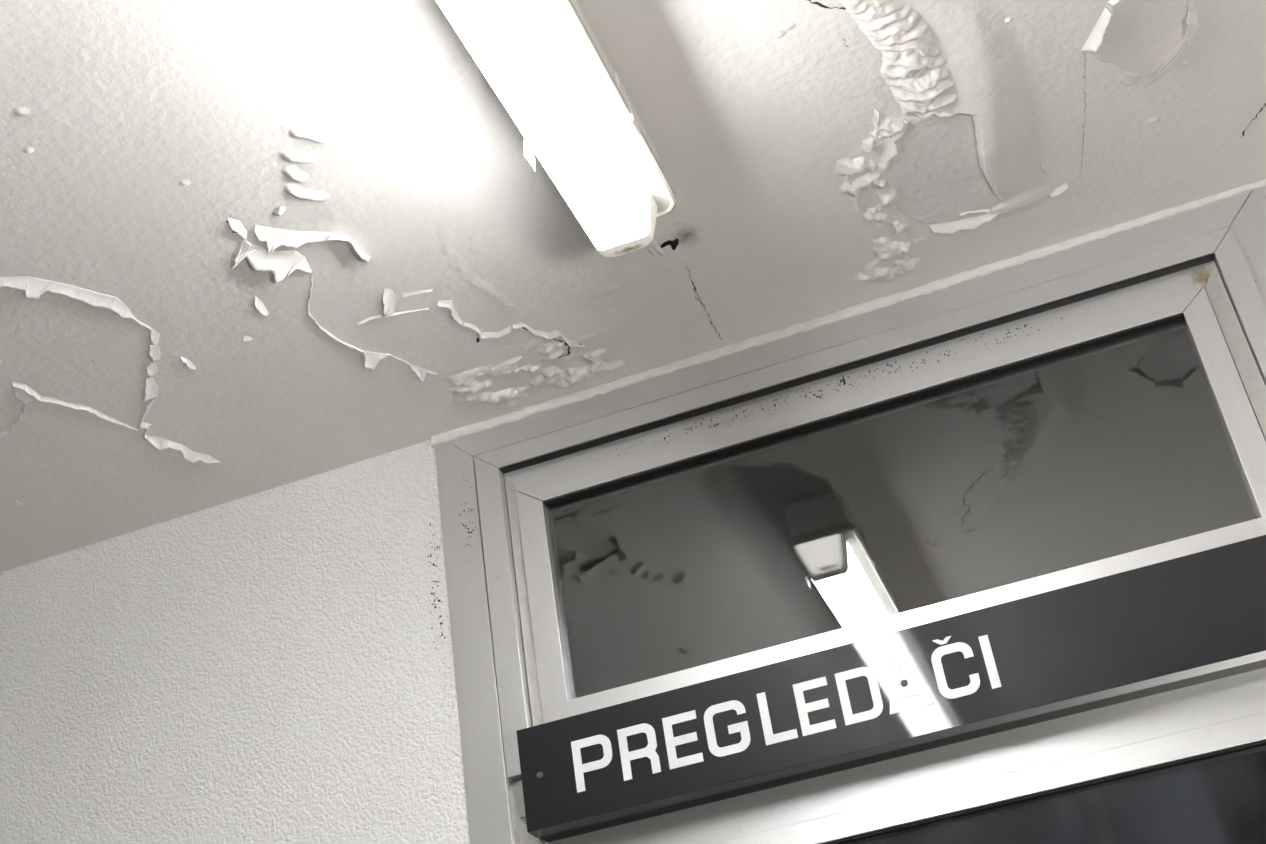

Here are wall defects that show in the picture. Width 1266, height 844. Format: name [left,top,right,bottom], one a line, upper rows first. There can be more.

crack [808,0,848,47]
peeling [1080,0,1199,86]
flaking render [833,107,1000,282]
peeling [0,276,220,464]
peeling [226,218,627,410]